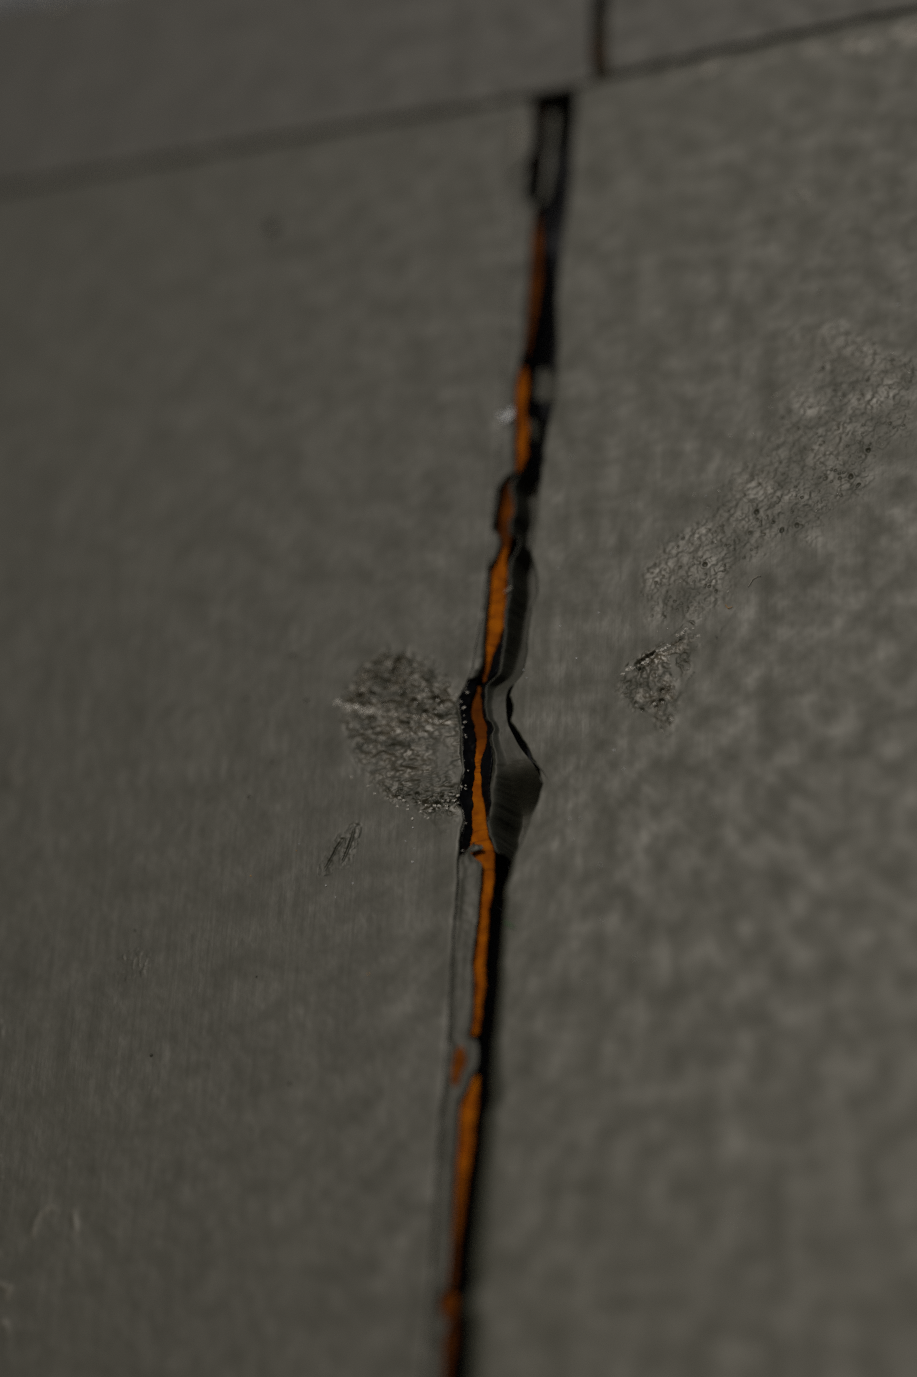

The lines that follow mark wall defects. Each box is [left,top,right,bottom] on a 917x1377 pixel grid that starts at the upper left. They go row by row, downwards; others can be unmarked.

spalling [333,640,469,835]
crack [424,99,561,1377]
spalling [614,607,718,740]